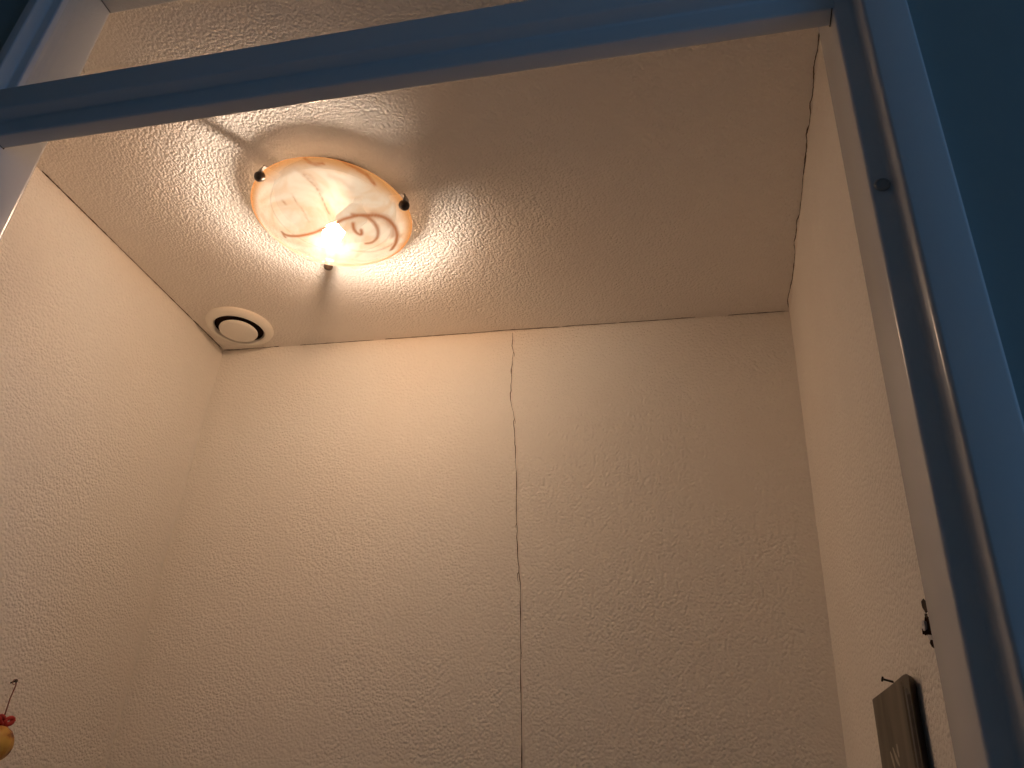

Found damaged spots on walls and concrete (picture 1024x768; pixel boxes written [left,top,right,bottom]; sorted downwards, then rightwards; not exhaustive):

crack [734,34,820,315]
crack [304,317,692,768]